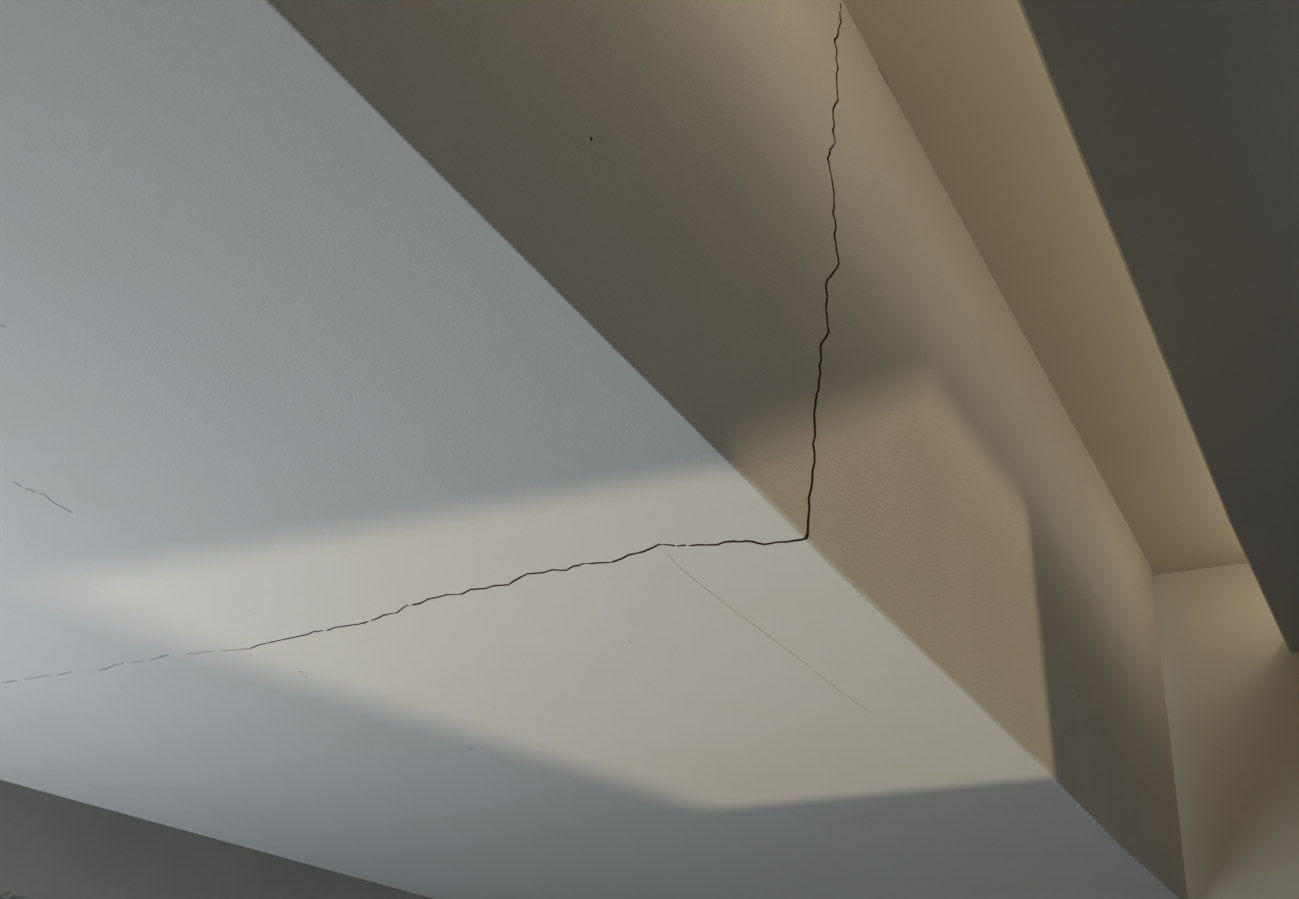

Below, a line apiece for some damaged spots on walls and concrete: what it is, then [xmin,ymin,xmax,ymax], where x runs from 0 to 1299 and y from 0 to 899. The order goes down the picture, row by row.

crack [2,3,872,714]